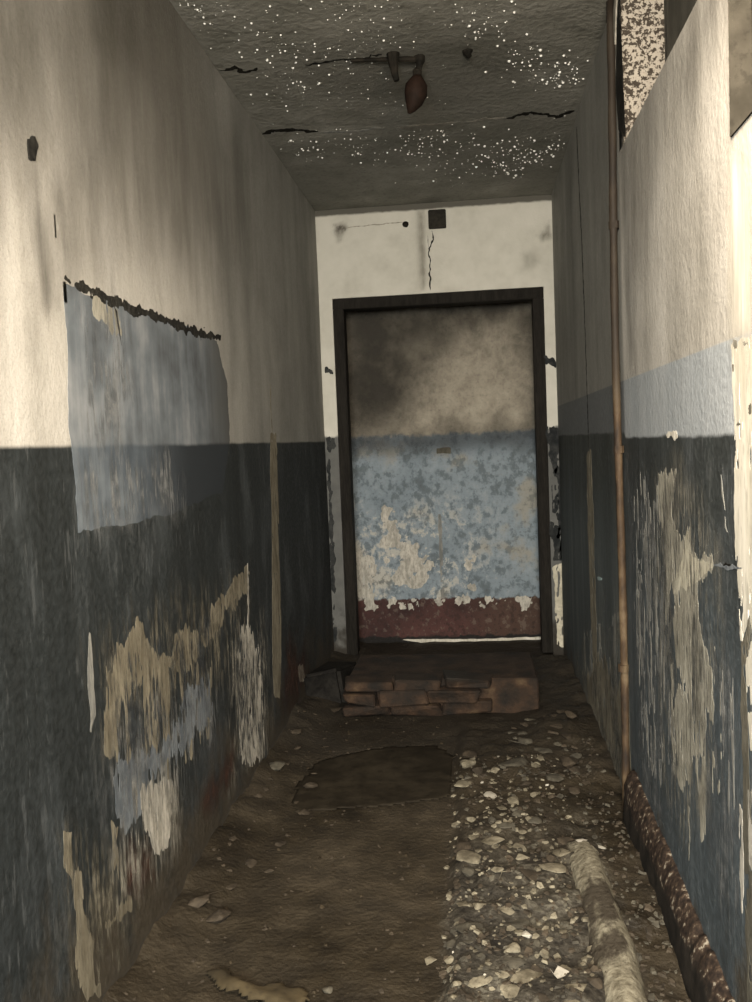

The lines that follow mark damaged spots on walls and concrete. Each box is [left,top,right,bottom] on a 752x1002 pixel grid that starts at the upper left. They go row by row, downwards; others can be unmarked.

crack [220,65,258,73]
crack [262,127,318,135]
peeling [92,295,122,336]
crack [427,233,435,290]
crack [507,110,589,440]
peeling [356,505,532,611]
peeling [63,387,281,1002]
peeling [577,335,752,1002]